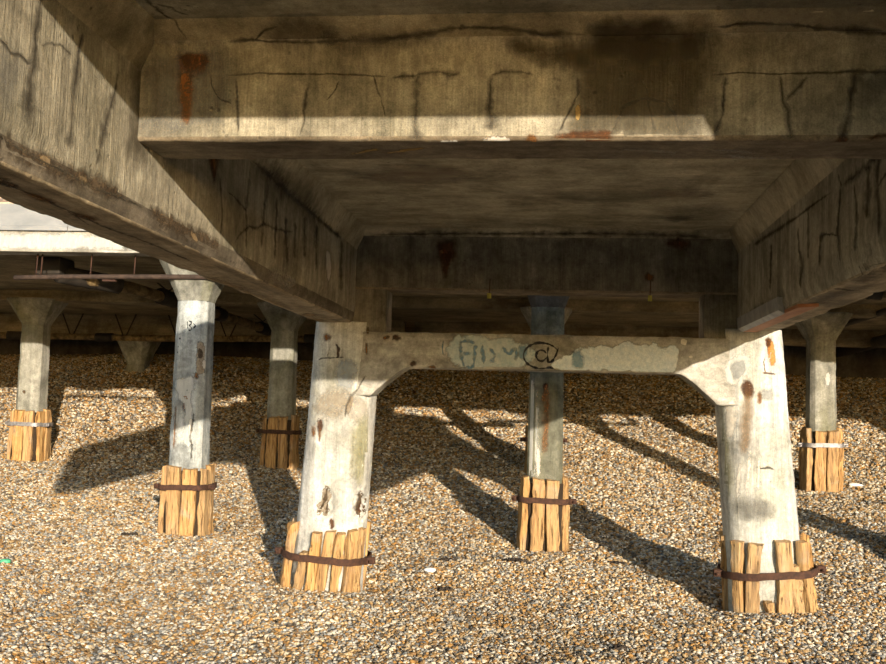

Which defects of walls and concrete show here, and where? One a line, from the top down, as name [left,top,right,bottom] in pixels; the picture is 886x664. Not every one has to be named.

crack [235,26,564,44]
crack [0,1,82,146]
crack [96,75,118,163]
rust [178,54,209,123]
crack [211,71,458,139]
crack [486,71,531,129]
water stain [510,21,706,135]
crack [715,69,886,140]
crack [220,163,343,288]
crack [755,133,886,287]
rust [741,380,761,447]
spalling [317,486,332,516]